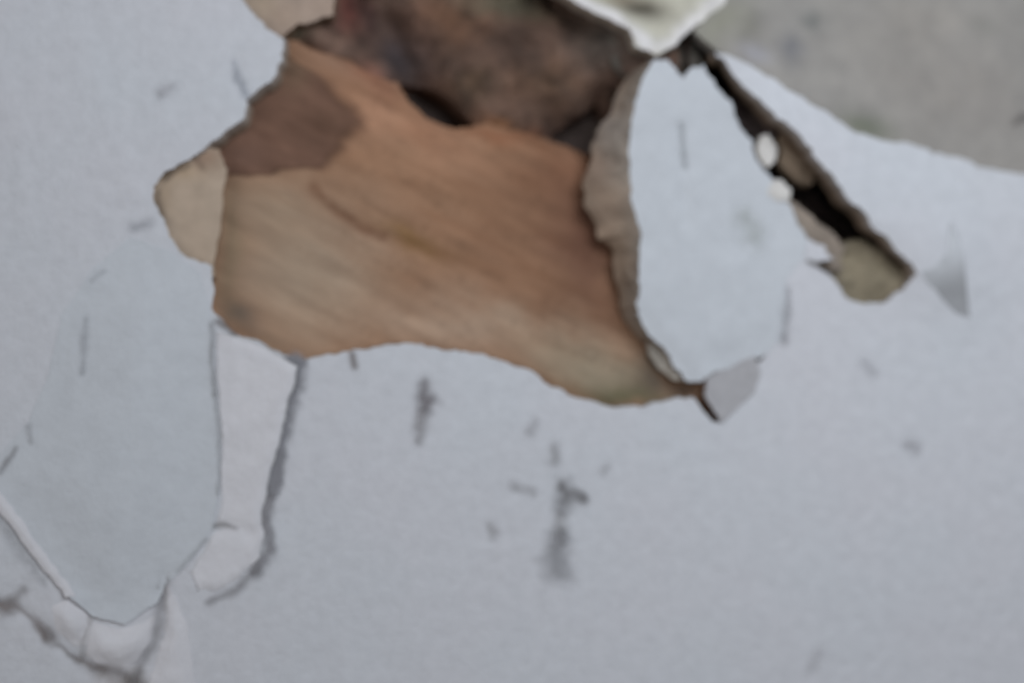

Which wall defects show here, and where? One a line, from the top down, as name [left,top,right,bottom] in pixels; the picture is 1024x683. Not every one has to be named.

flaking render [153,0,1024,591]
crack [210,353,306,601]
flaking render [52,583,195,683]